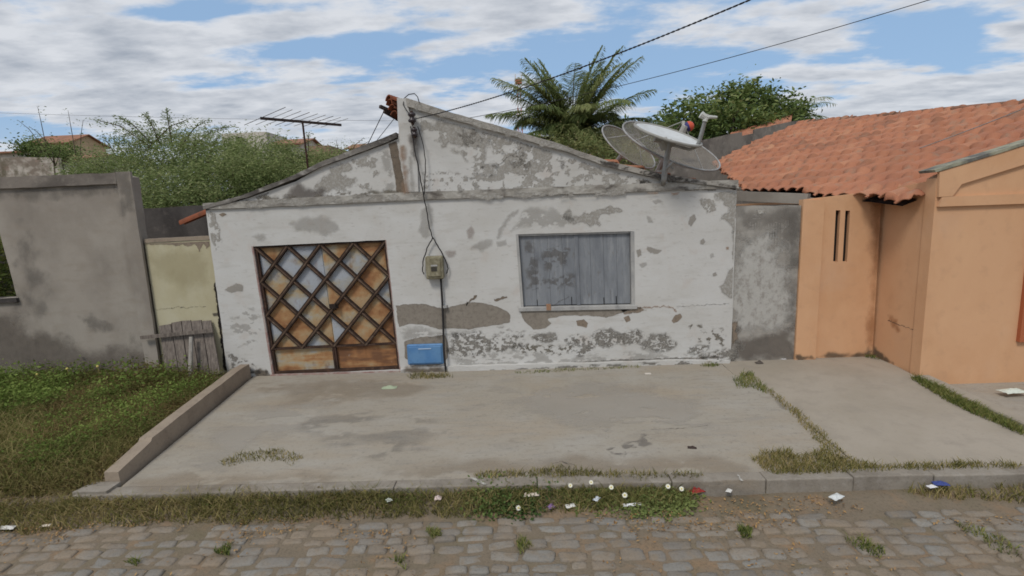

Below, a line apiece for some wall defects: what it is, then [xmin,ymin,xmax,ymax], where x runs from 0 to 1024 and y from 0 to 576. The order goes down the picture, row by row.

peeling [417,120,650,199]
peeling [563,206,622,226]
flaking render [396,295,643,366]